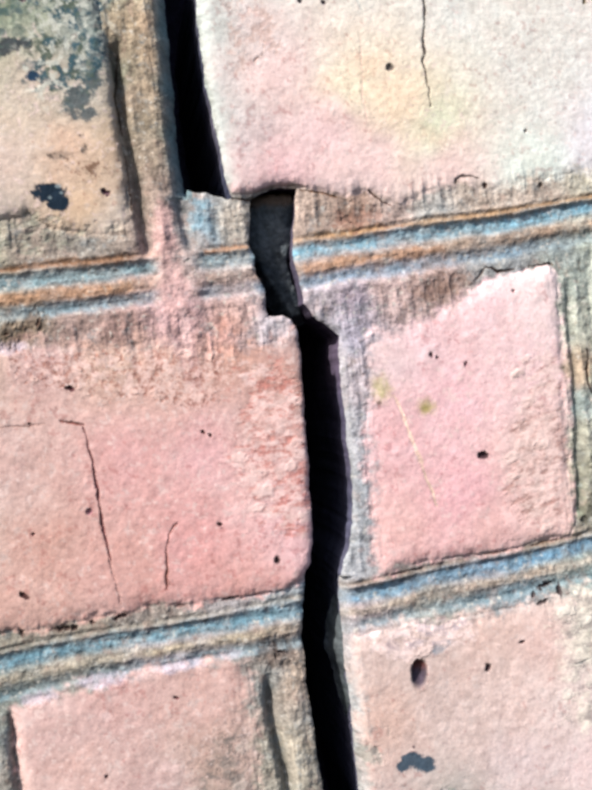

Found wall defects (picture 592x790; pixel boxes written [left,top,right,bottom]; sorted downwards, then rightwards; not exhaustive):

leakage [0,0,130,214]
crack [113,53,133,213]
crack [366,188,392,206]
crack [421,0,432,108]
crack [164,0,358,790]
crack [0,419,130,634]
crack [18,627,26,640]